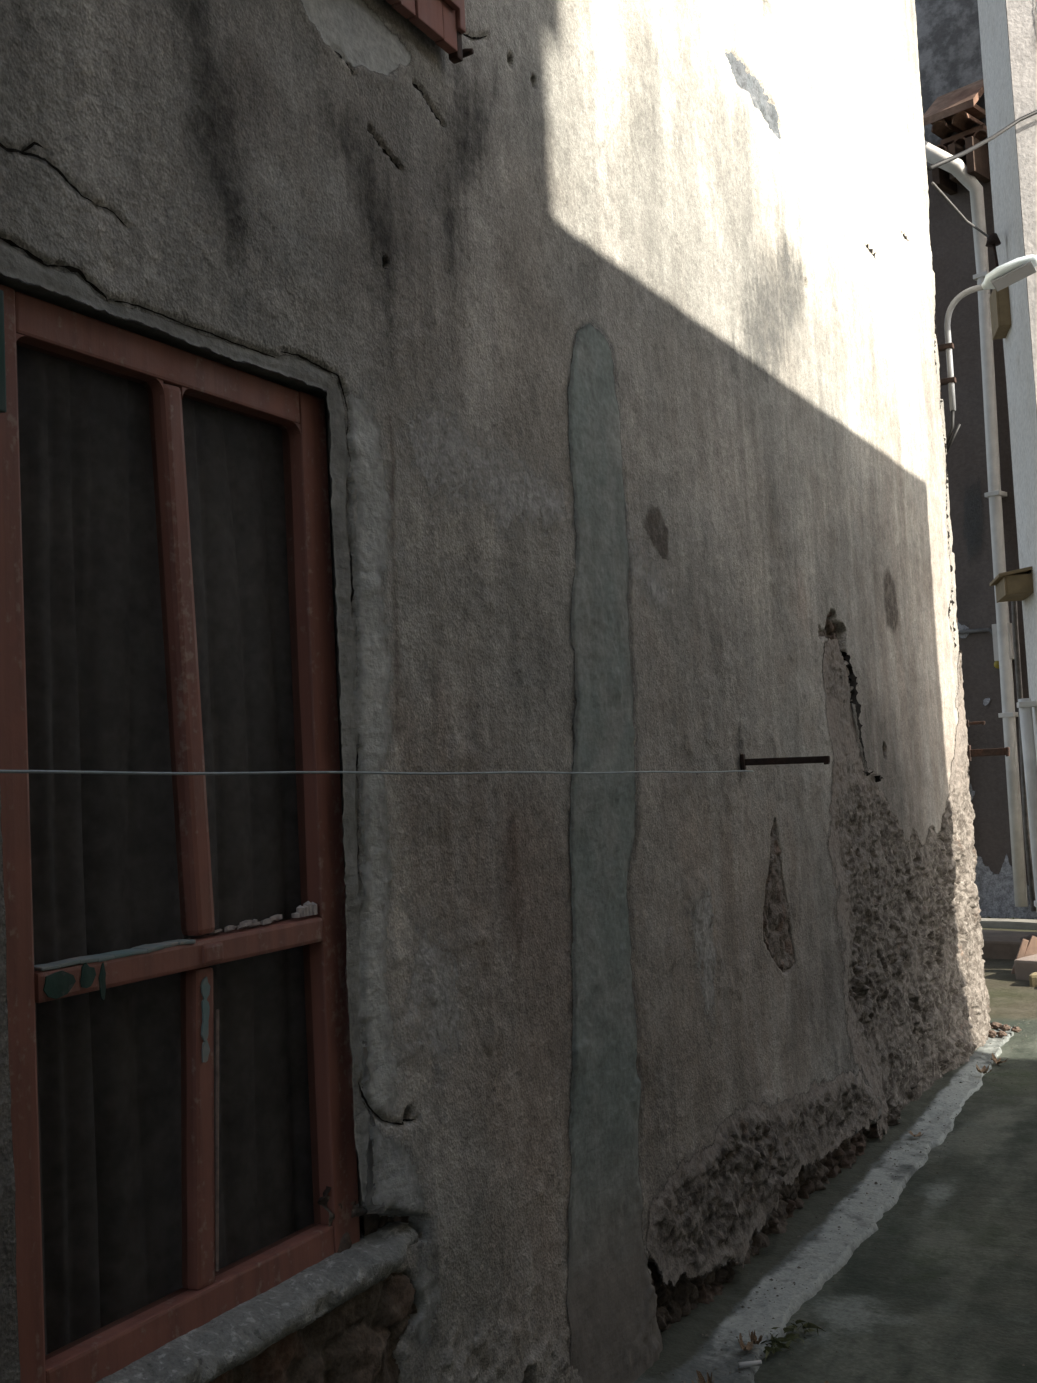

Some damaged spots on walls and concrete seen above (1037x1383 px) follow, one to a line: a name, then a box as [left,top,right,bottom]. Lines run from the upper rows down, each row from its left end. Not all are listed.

flaking render [724,49,781,139]
crack [0,142,128,228]
spalling [647,612,1037,1332]